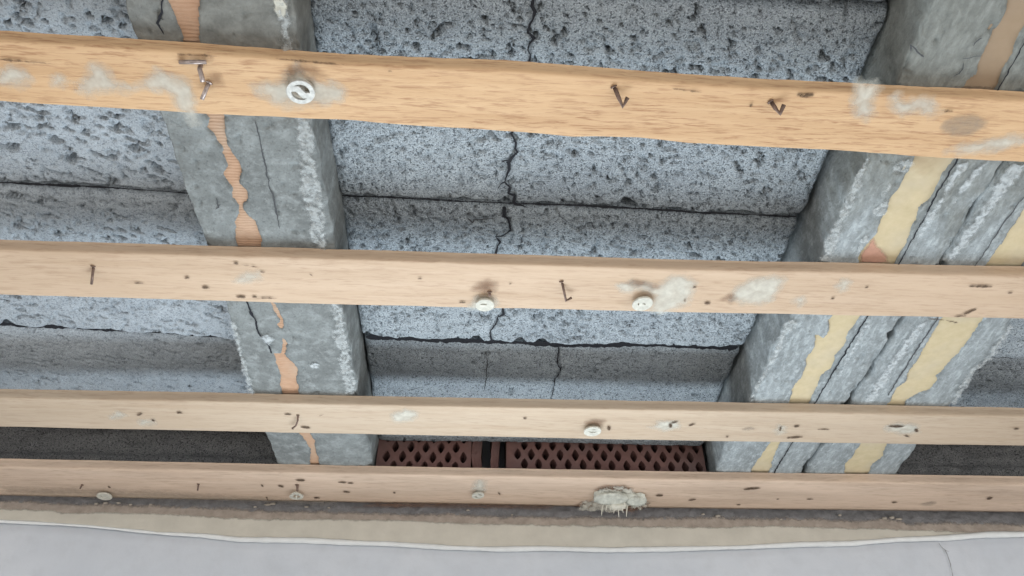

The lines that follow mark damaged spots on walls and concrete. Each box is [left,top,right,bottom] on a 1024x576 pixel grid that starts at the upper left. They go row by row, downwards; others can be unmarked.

crack [527,0,537,62]
crack [255,122,280,228]
crack [468,131,529,254]
crack [246,301,272,353]
crack [484,308,510,390]
crack [551,343,563,397]